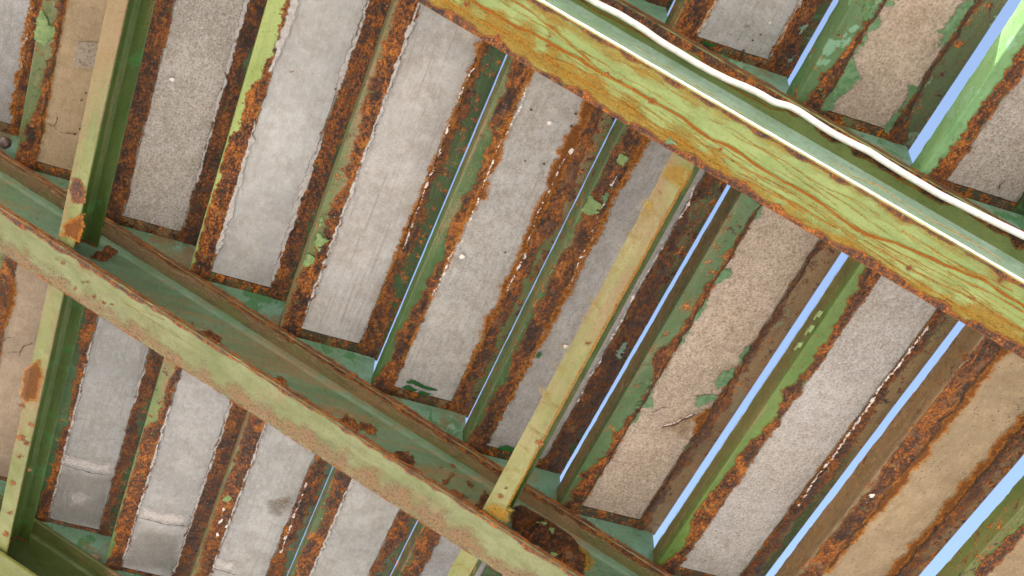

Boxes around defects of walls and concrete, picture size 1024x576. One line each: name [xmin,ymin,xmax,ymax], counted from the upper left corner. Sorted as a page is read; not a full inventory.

rust [0,204,594,576]
rust [267,0,392,302]
rust [523,486,666,576]
rust [508,167,692,505]
rust [641,212,755,400]
crack [585,204,823,515]
rust [429,0,1024,313]
peeling [820,0,899,111]
rust [887,414,1024,576]